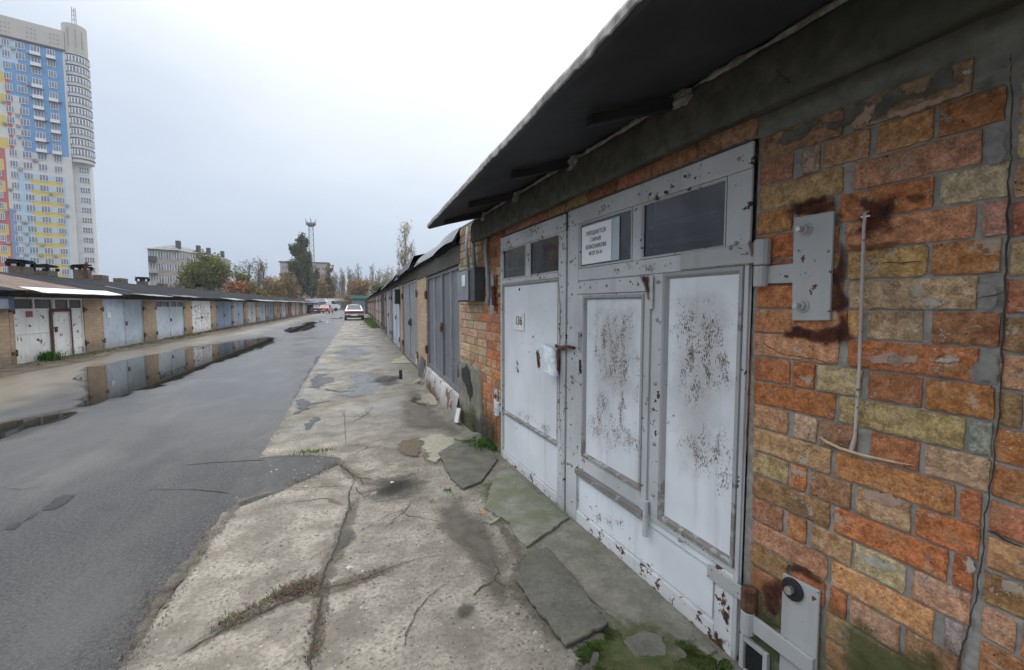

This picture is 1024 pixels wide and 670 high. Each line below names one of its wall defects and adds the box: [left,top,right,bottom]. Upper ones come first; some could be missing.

peeling [763,63,992,148]
crack [178,344,436,670]
rust [784,194,923,345]
crack [957,54,1022,670]